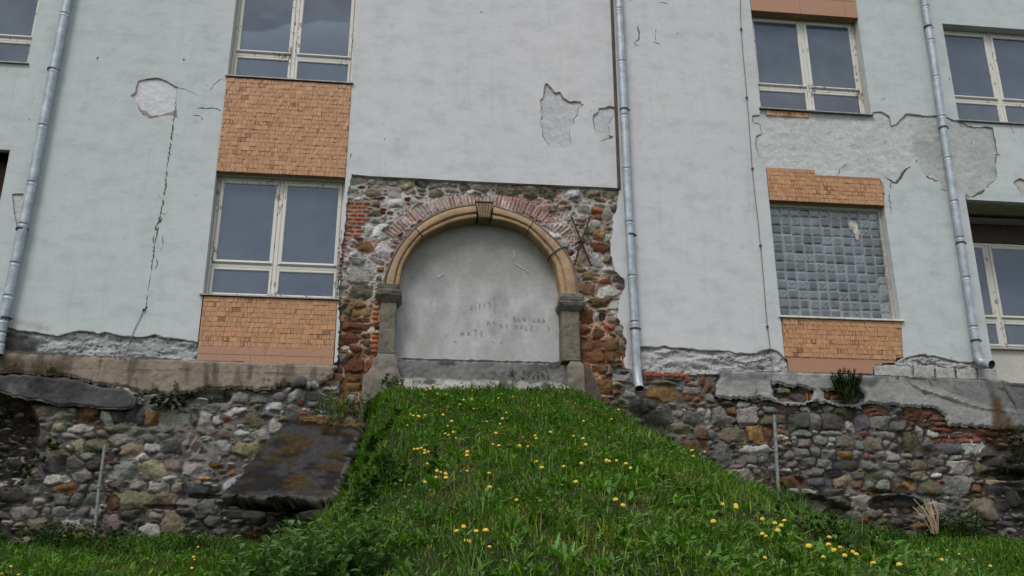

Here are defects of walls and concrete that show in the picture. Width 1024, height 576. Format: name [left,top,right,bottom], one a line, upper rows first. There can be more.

flaking render [131,77,198,118]
flaking render [540,83,615,148]
flaking render [752,109,997,199]
crack [146,79,221,306]
flaking render [332,176,788,417]
flaking render [4,327,198,360]
flaking render [895,354,979,370]